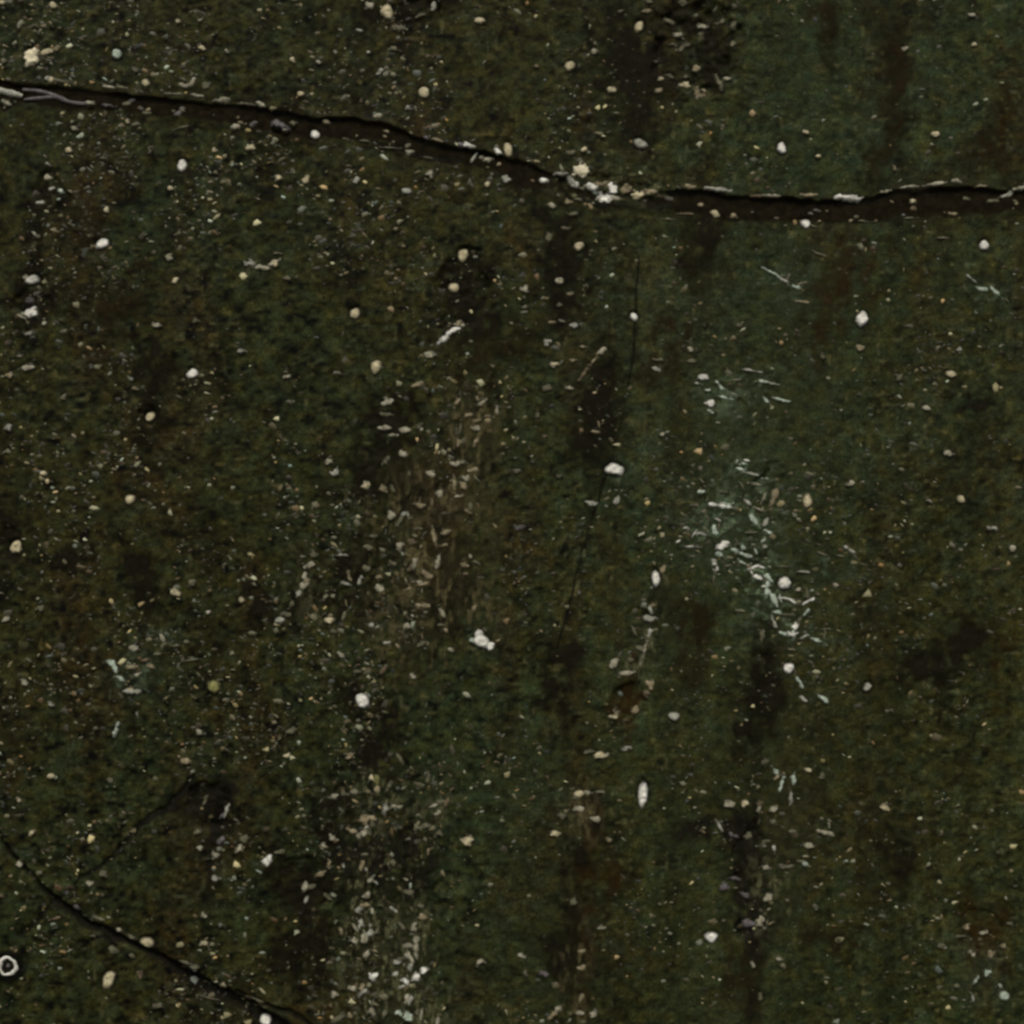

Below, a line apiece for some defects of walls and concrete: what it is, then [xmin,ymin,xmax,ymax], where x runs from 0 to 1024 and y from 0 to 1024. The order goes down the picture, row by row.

crack [0,76,1024,240]
crack [1,778,310,1024]